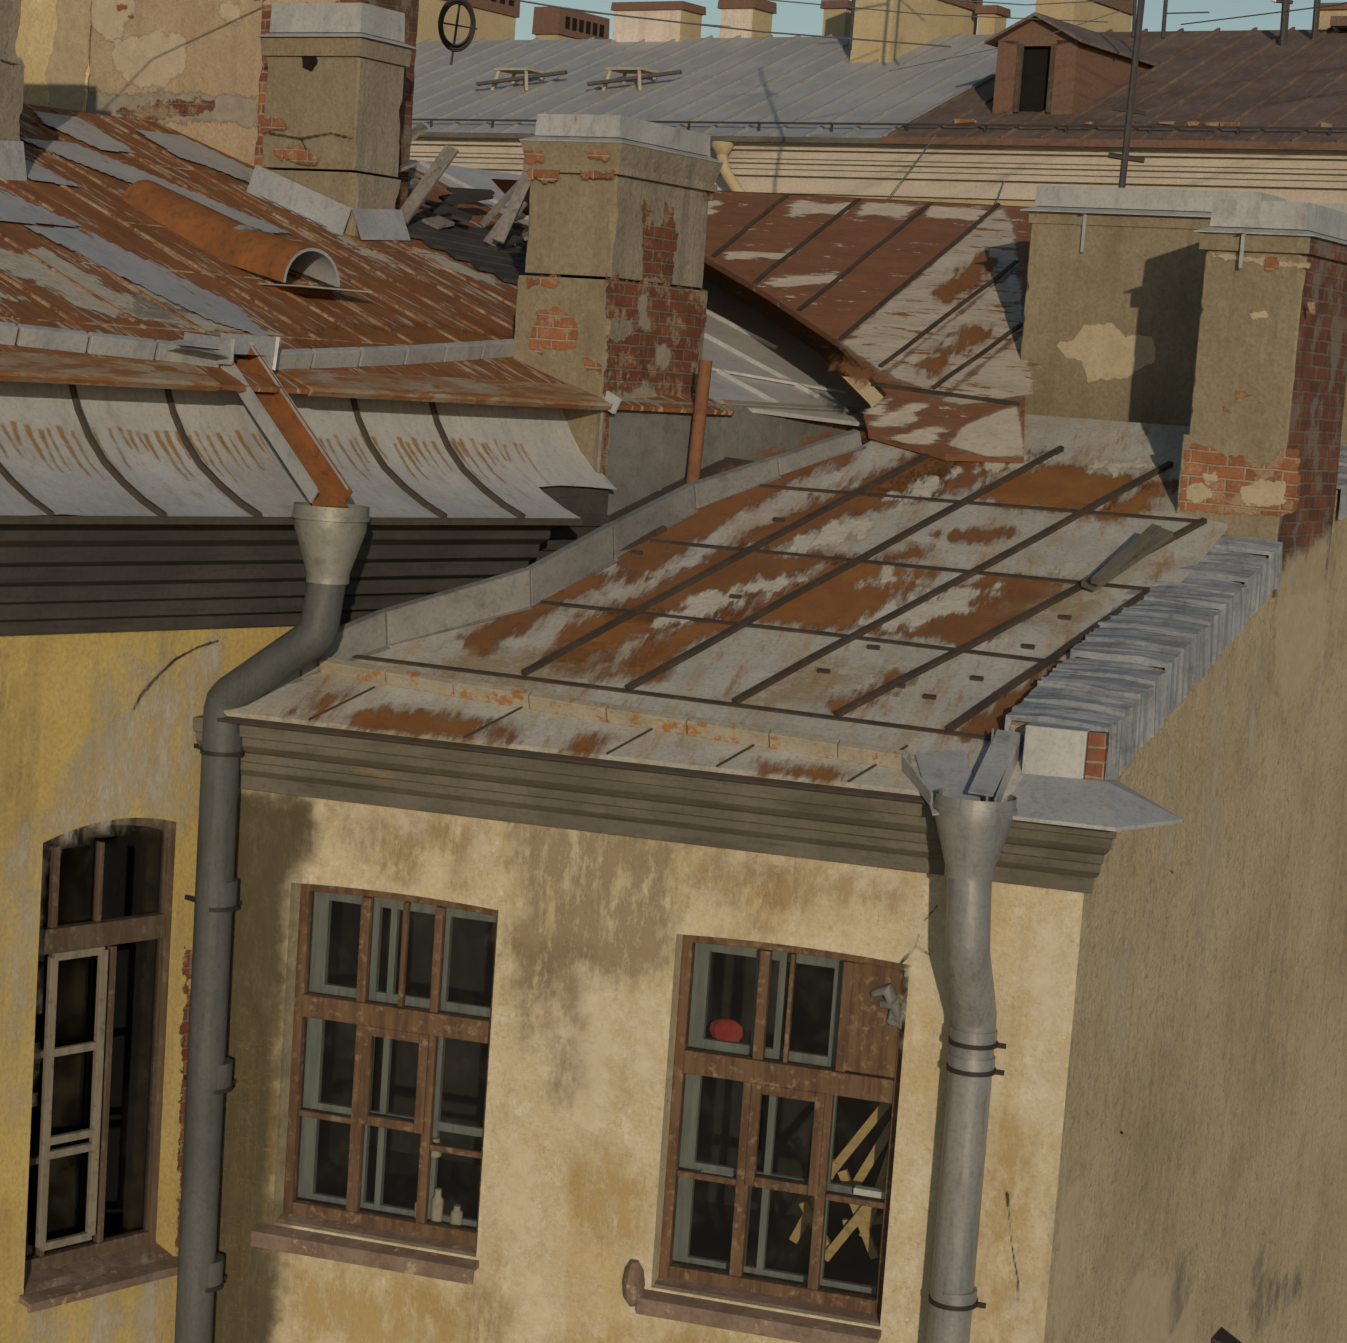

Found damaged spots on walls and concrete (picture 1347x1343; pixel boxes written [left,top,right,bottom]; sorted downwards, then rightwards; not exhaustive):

corrosion [278,322,514,349]
flaking render [528,200,707,477]
peeling [1056,323,1156,383]
flaking render [1177,443,1301,517]
peeling [645,517,875,637]
corrosion [459,451,1179,684]
peeling [855,565,1005,633]
damp [50,638,222,838]
corrosion [350,705,518,746]
corrosion [959,664,1057,743]
damp [511,827,669,1021]
damp [89,1280,167,1343]